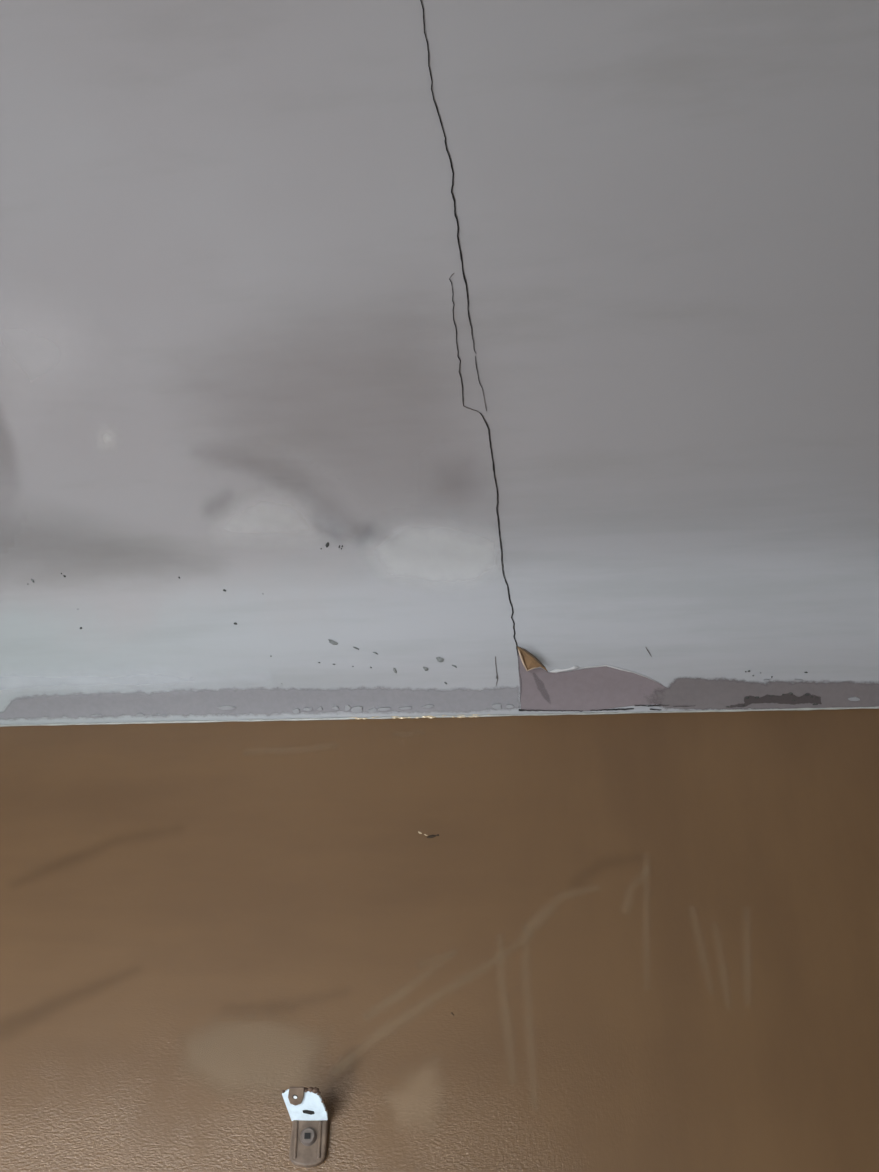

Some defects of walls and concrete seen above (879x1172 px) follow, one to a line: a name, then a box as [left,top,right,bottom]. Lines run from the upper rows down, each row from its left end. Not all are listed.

peeling [0,654,879,720]
crack [420,0,521,699]